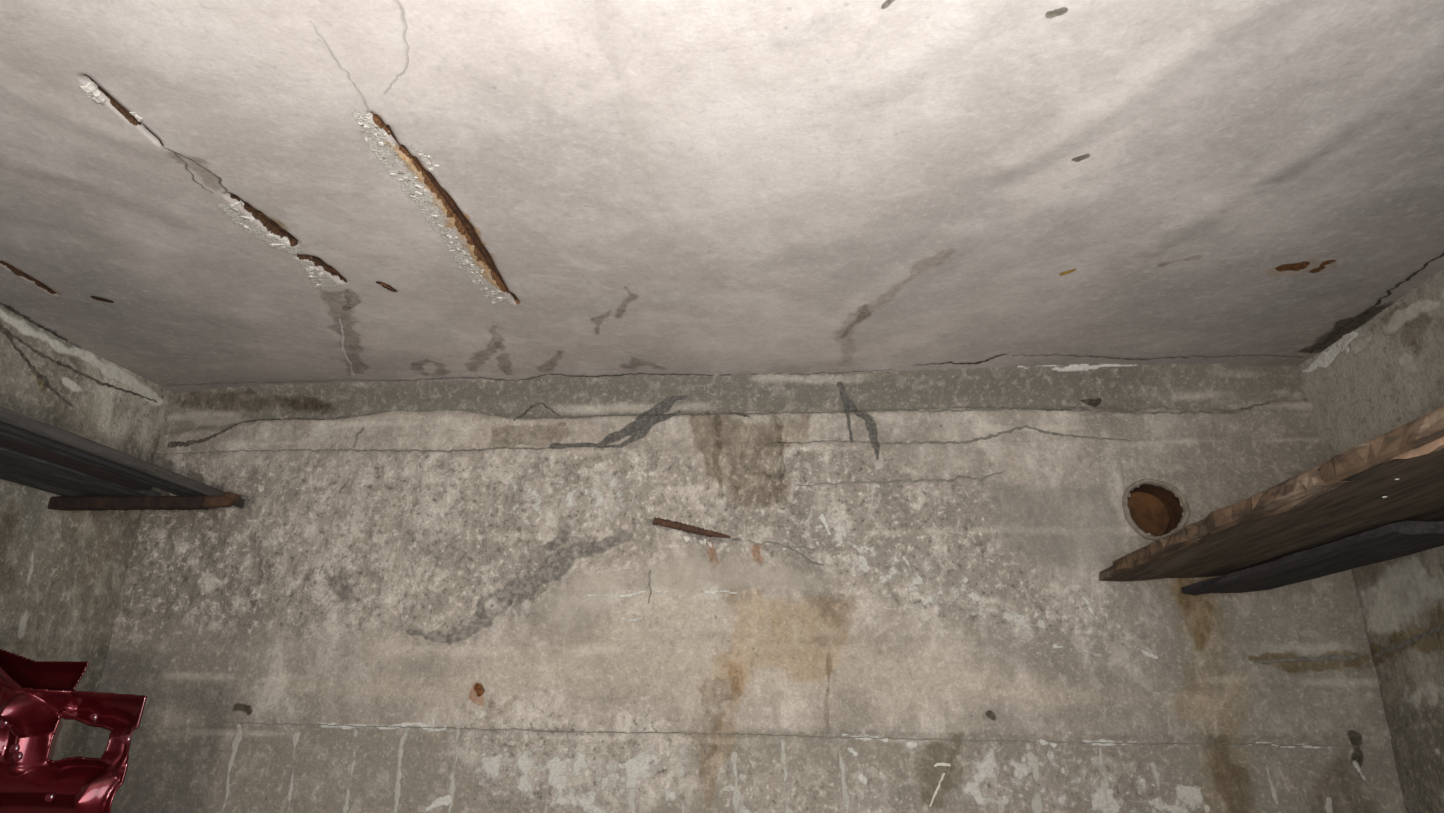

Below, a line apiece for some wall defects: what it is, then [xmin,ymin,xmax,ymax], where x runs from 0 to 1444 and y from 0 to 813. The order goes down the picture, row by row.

crack [309,0,409,113]
spalling [80,74,164,146]
spalling [216,192,347,288]
spalling [352,111,520,304]
rust [1275,260,1336,273]
crack [0,253,1444,454]
crack [674,400,1279,486]
damp [842,734,888,742]
damp [425,795,452,812]